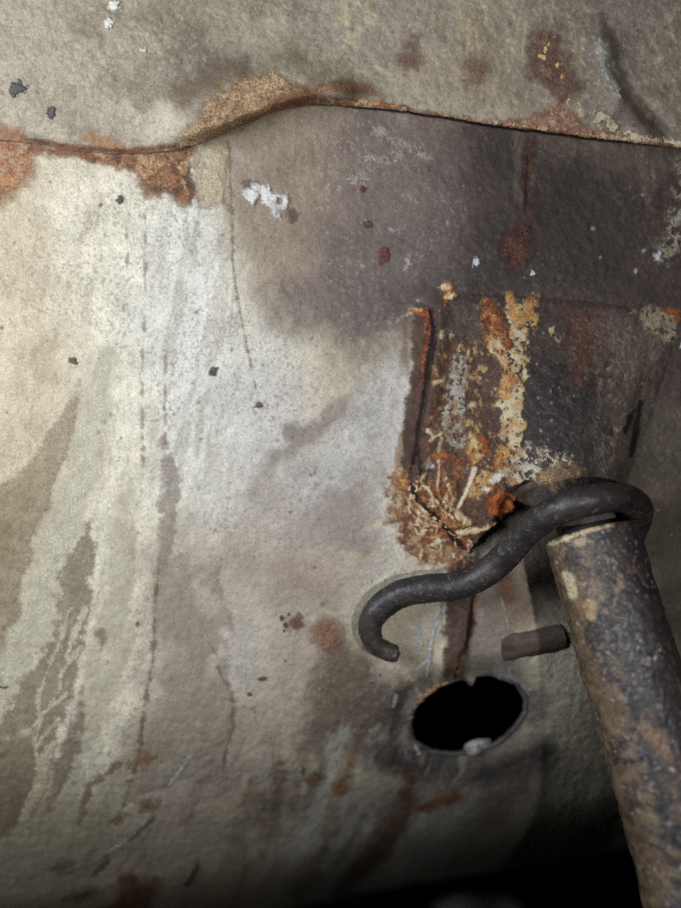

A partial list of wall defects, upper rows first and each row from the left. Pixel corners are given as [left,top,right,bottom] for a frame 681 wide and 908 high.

corrosion [0,126,196,207]
water stain [227,144,239,300]
corrosion [401,27,681,267]
corrosion [480,298,511,356]
corrosion [383,466,473,573]
corrosion [487,490,516,519]
water stain [0,351,235,899]
corrosion [406,593,480,723]